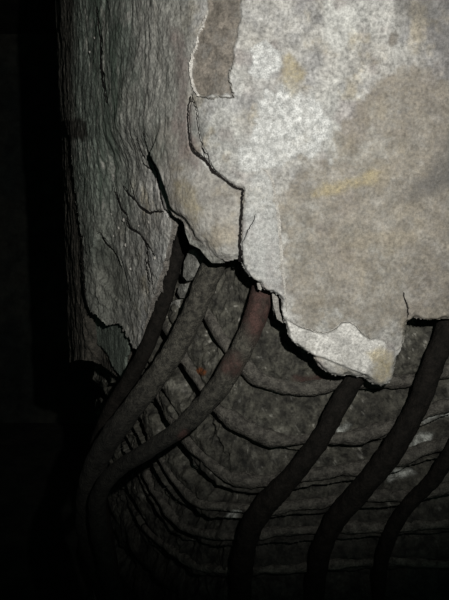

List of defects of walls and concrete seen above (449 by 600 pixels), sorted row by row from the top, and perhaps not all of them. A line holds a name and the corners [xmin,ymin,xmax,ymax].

peeling [188,0,240,100]
crack [113,132,164,294]
crack [187,96,256,262]
spalling [107,318,225,467]
spalling [107,440,265,600]
spalling [137,211,262,383]
spalling [189,411,304,475]
spalling [220,375,335,436]
spalling [251,506,331,600]
spalling [250,292,413,432]
spalling [377,451,442,491]
spalling [393,317,438,375]